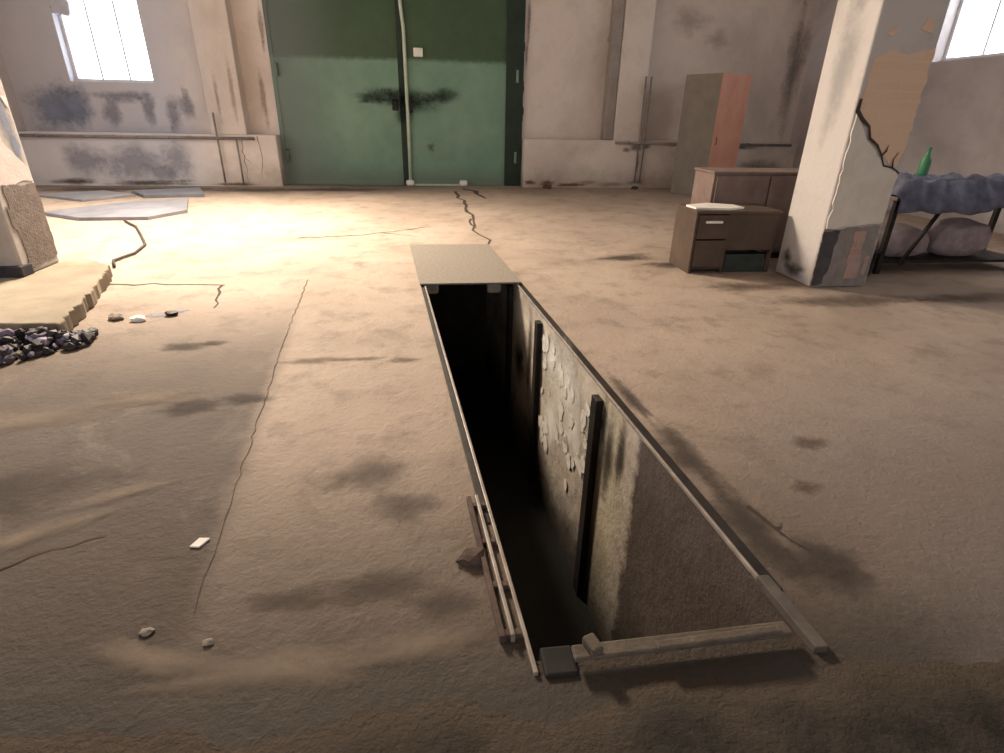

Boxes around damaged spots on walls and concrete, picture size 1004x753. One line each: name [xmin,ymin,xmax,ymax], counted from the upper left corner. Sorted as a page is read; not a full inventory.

leakage [0,104,21,159]
leakage [107,93,153,121]
flaking render [861,47,936,166]
leakage [63,149,183,191]
leakage [220,183,285,192]
crack [453,189,492,244]
spalling [810,225,880,286]
leakage [600,404,624,487]